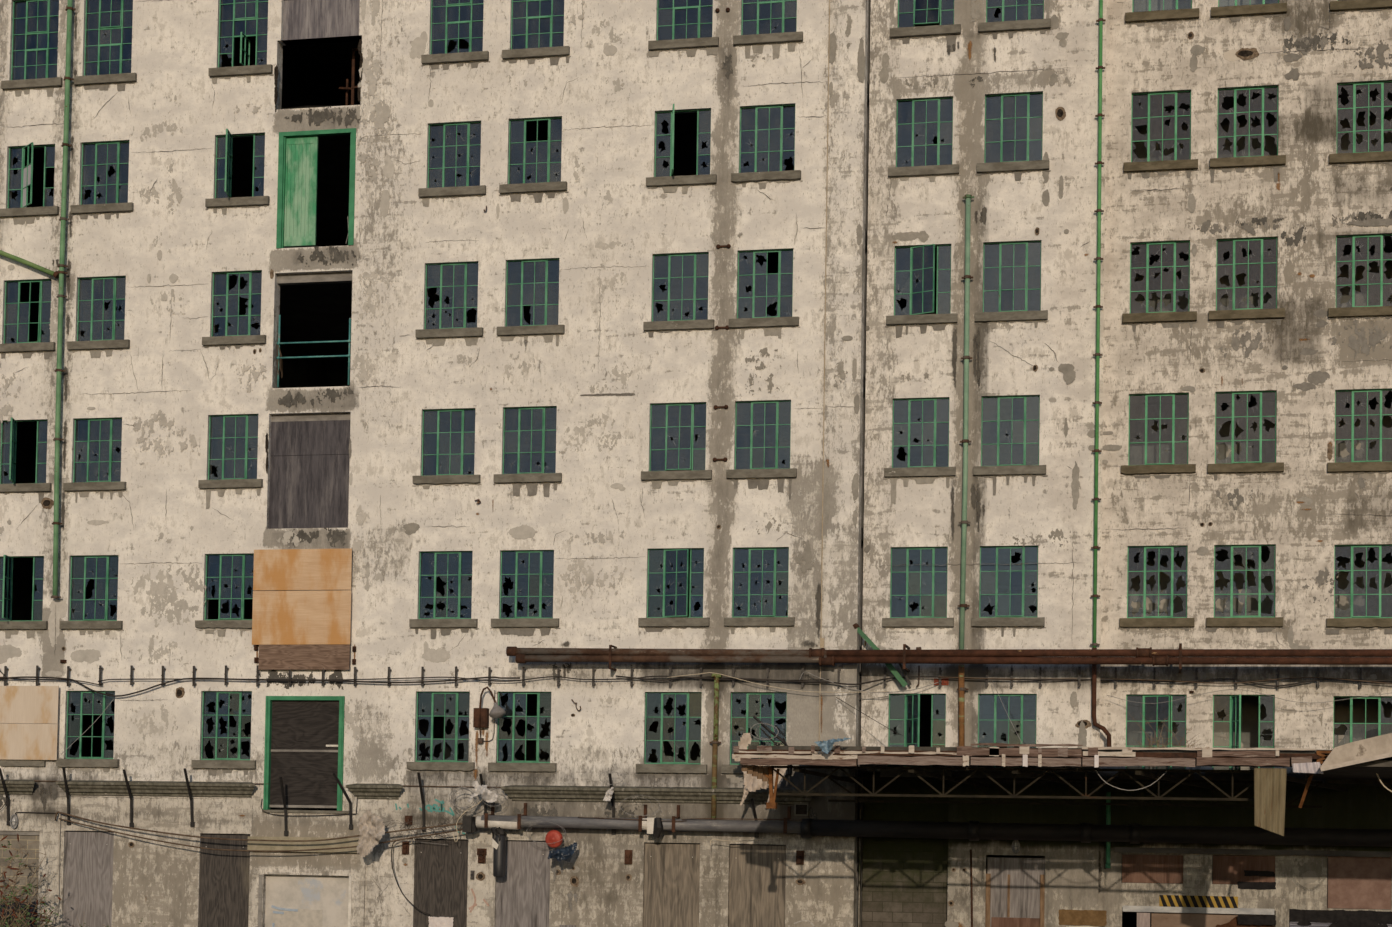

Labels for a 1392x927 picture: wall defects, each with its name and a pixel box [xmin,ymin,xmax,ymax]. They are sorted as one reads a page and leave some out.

leakage [722,54,733,80]
leakage [1284,32,1351,52]
peeling [357,0,399,199]
peeling [1122,166,1287,236]
leakage [1354,210,1392,221]
peeling [133,410,200,465]
peeling [0,562,252,677]